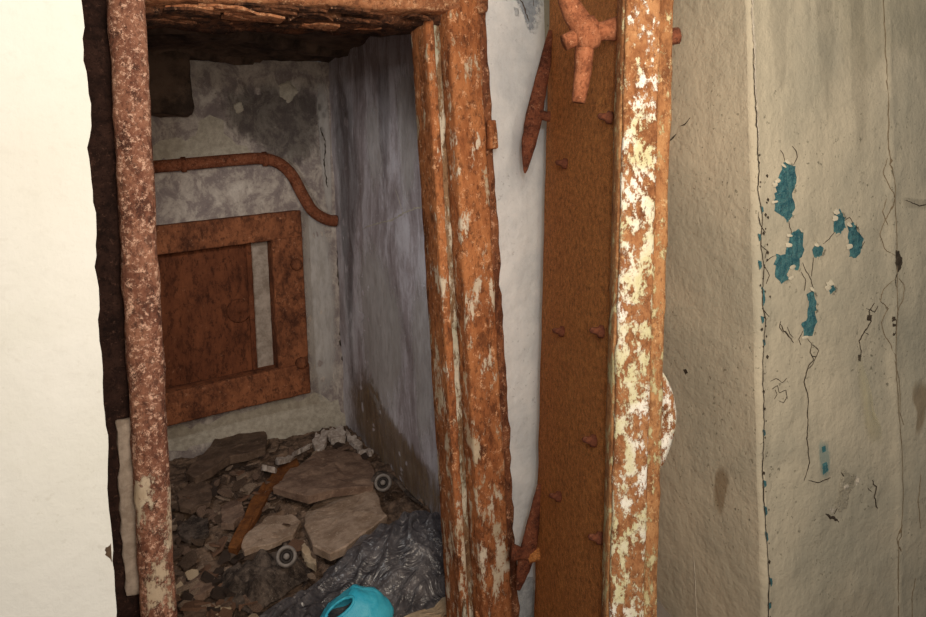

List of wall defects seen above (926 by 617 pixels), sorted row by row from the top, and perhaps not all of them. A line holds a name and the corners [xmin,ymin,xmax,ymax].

rust [162,2,391,31]
crack [753,48,831,617]
peeling [766,146,865,344]
crack [858,0,921,617]